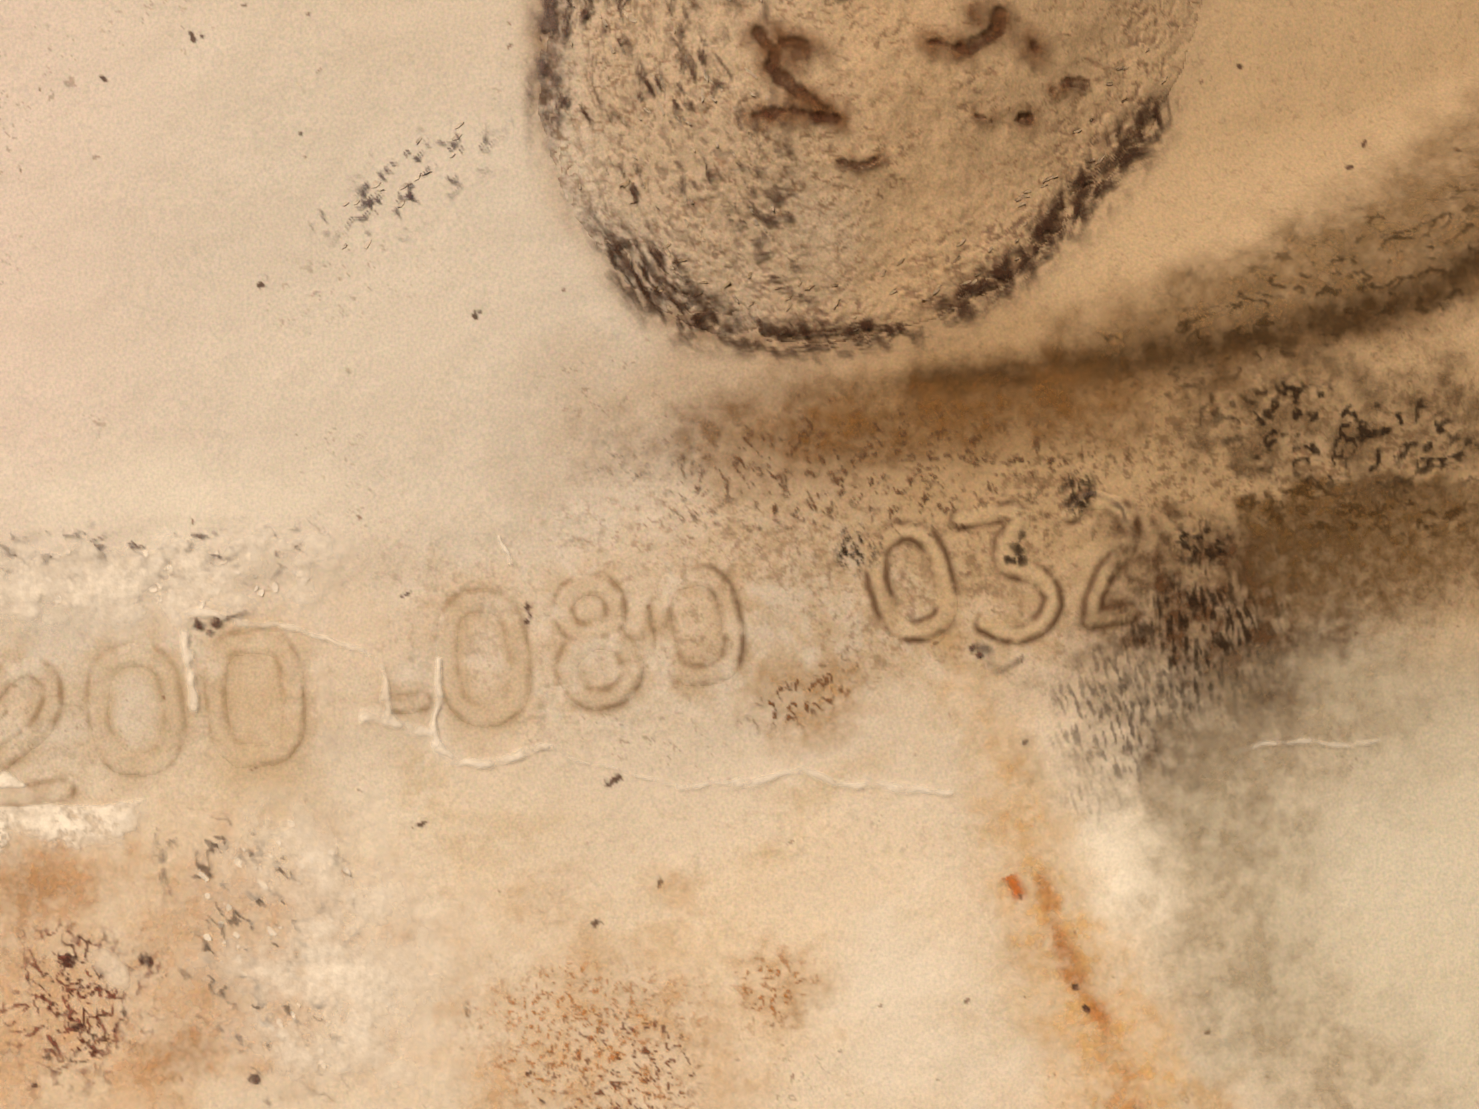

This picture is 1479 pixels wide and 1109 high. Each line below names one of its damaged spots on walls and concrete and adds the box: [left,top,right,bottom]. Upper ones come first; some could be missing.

leakage [695,174,1479,800]
crack [182,610,236,710]
crack [360,658,546,768]
rust [0,847,271,1100]
rust [509,971,692,1109]
rust [1005,860,1154,1080]